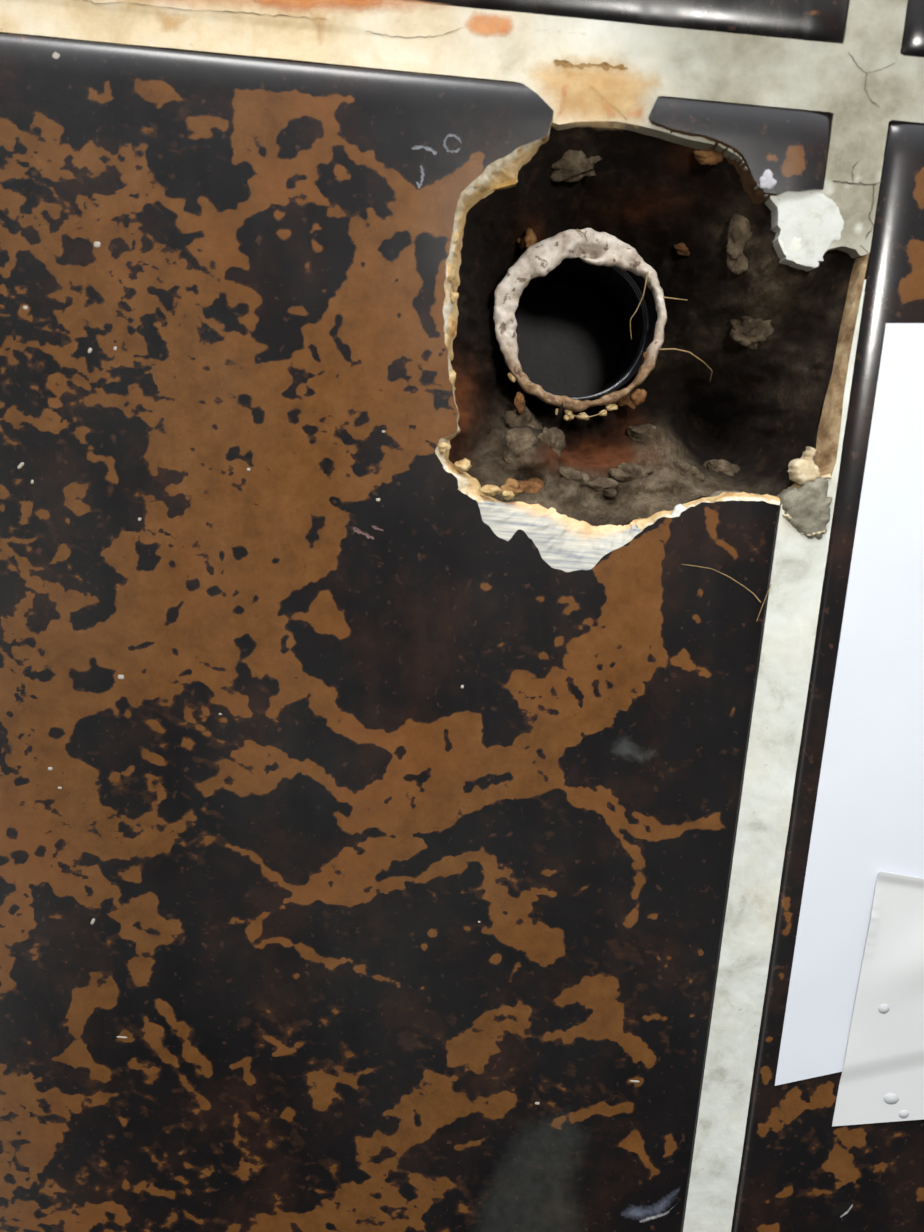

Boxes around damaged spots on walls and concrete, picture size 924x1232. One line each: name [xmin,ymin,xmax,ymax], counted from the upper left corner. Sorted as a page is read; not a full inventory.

rust [240,0,422,23]
rust [540,69,640,114]
spalling [435,119,869,572]